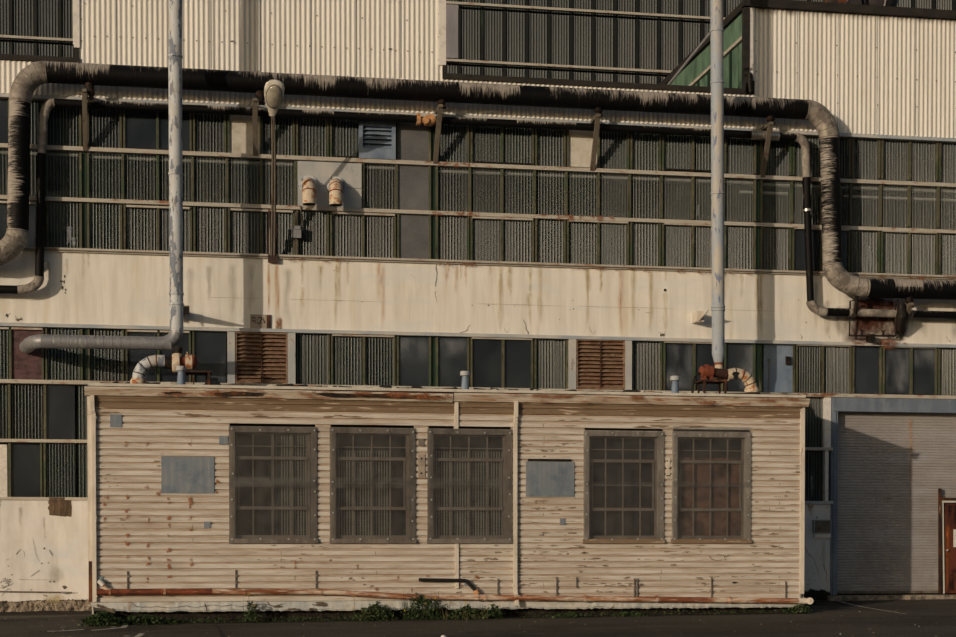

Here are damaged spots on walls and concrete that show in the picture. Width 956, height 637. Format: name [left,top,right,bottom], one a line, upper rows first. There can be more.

rust [849,298,907,348]
peeling [453,522,644,593]
spalling [0,581,116,614]
spalling [274,602,327,611]